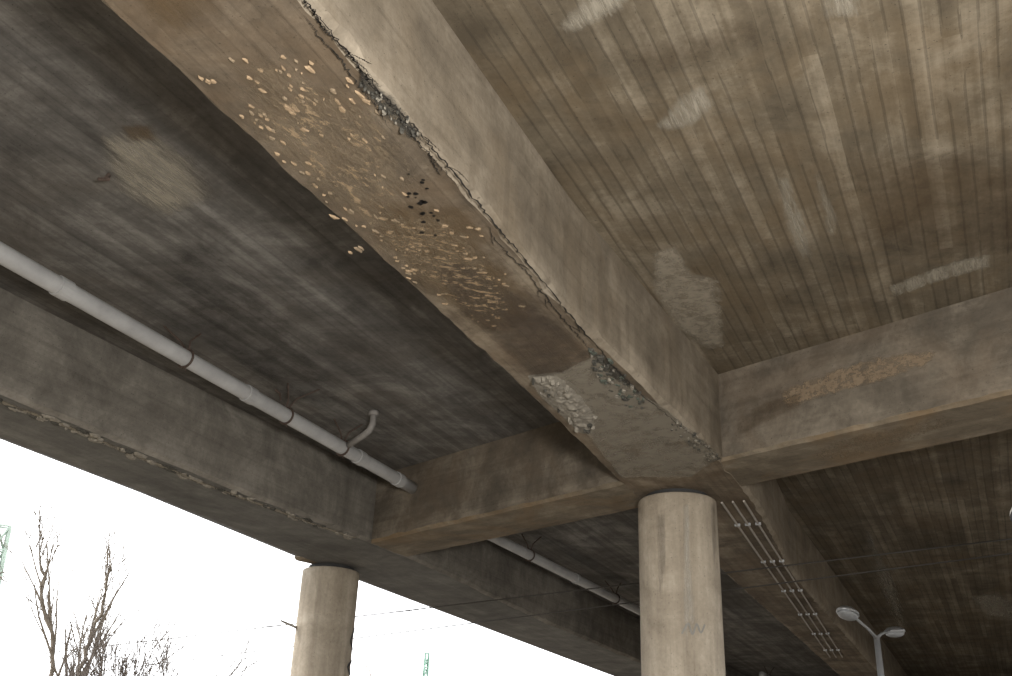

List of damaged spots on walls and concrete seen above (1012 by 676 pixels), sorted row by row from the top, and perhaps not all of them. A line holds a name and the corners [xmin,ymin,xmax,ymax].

peeling [228,55,525,326]
crack [303,0,716,455]
spalling [588,348,645,409]